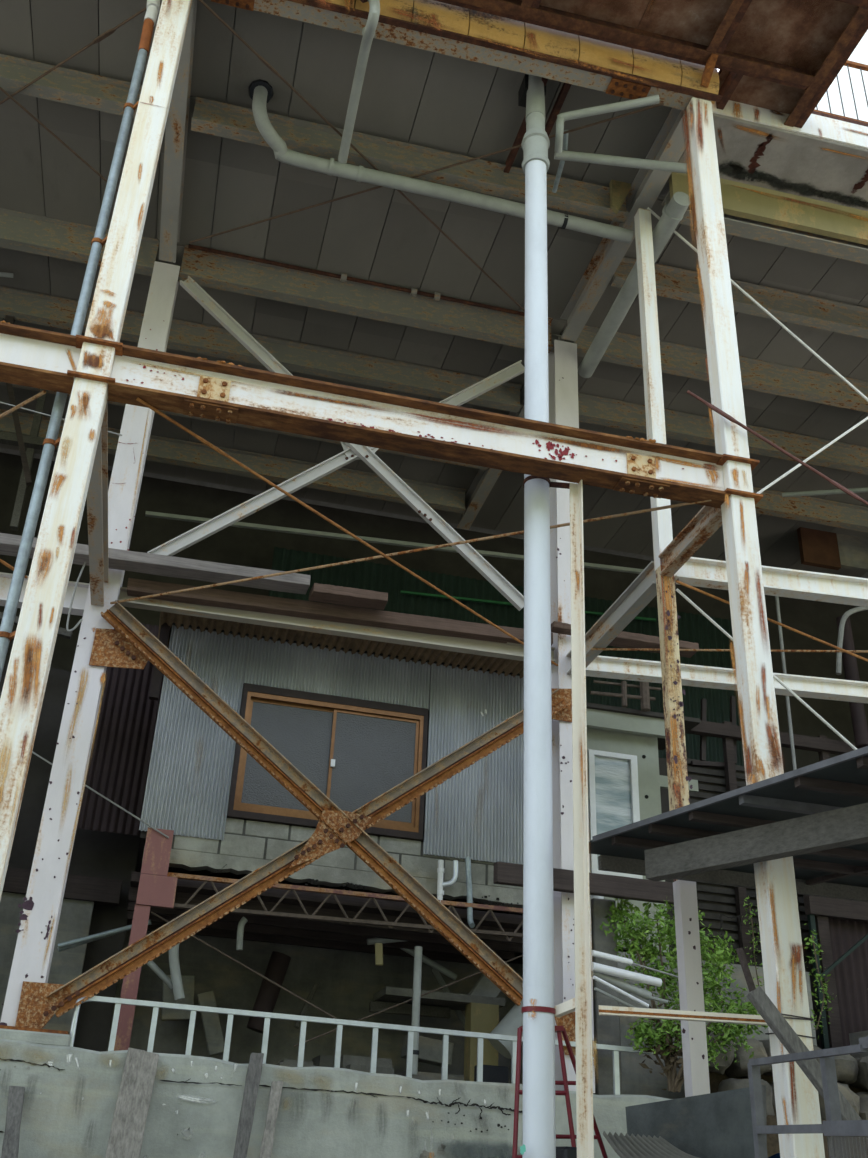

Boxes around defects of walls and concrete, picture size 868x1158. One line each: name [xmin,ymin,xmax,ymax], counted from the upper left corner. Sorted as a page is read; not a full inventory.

rust [682,100,707,232]
water stain [718,162,868,208]
rust [277,390,382,410]
rust [543,437,631,453]
rust [38,526,75,578]
rust [745,562,766,638]
rust [9,604,54,704]
rust [739,667,781,783]
rust [769,889,803,1013]
crack [0,1058,65,1071]
crack [160,1078,523,1116]
water stain [450,1136,513,1158]